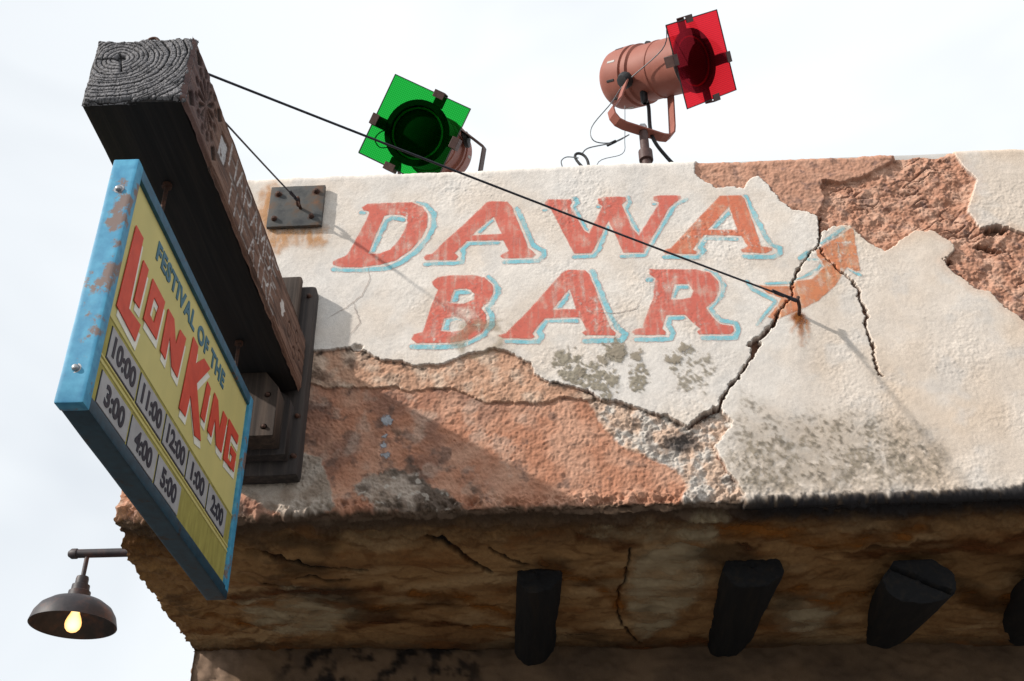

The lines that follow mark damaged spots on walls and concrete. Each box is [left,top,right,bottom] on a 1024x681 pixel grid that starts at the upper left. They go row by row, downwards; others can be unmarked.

spalling [694,152,1024,320]
crack [688,232,882,430]
rust [792,312,807,331]
spalling [113,491,148,526]
crack [427,534,524,572]
spalling [237,337,746,523]
crack [616,547,641,644]
leakage [729,417,1024,517]